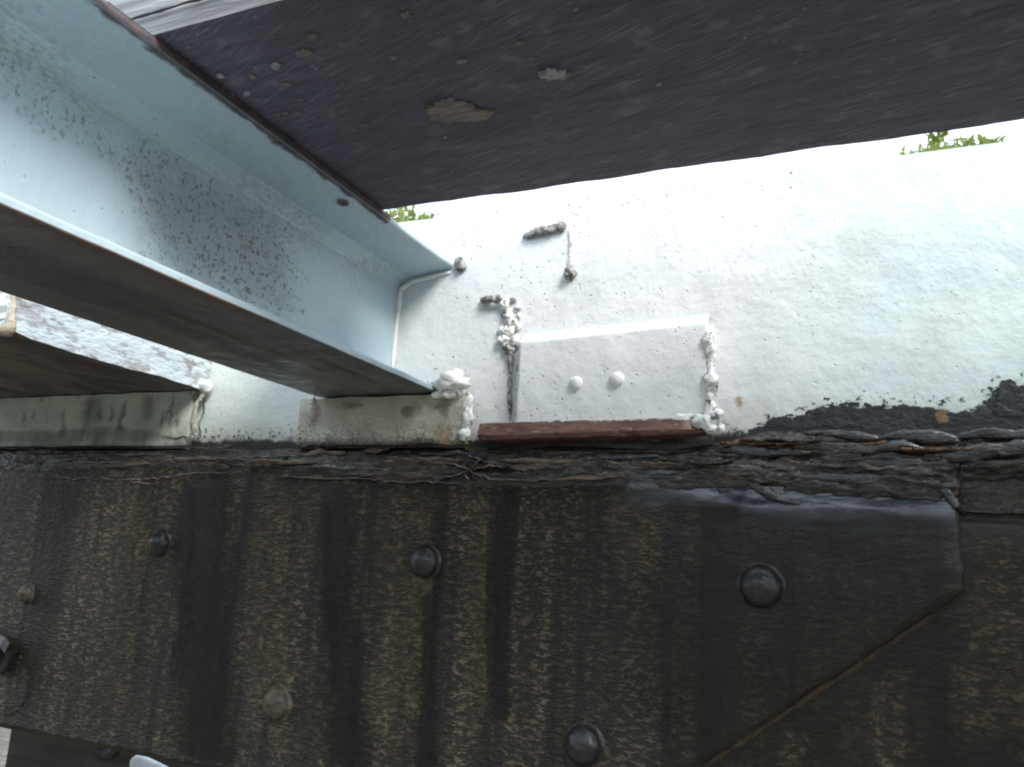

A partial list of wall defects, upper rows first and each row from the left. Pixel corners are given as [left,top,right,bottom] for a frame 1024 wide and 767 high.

peeling [537,67,567,81]
corrosion [90,0,391,224]
spalling [425,98,495,124]
crack [277,455,565,485]
leakage [321,485,366,767]